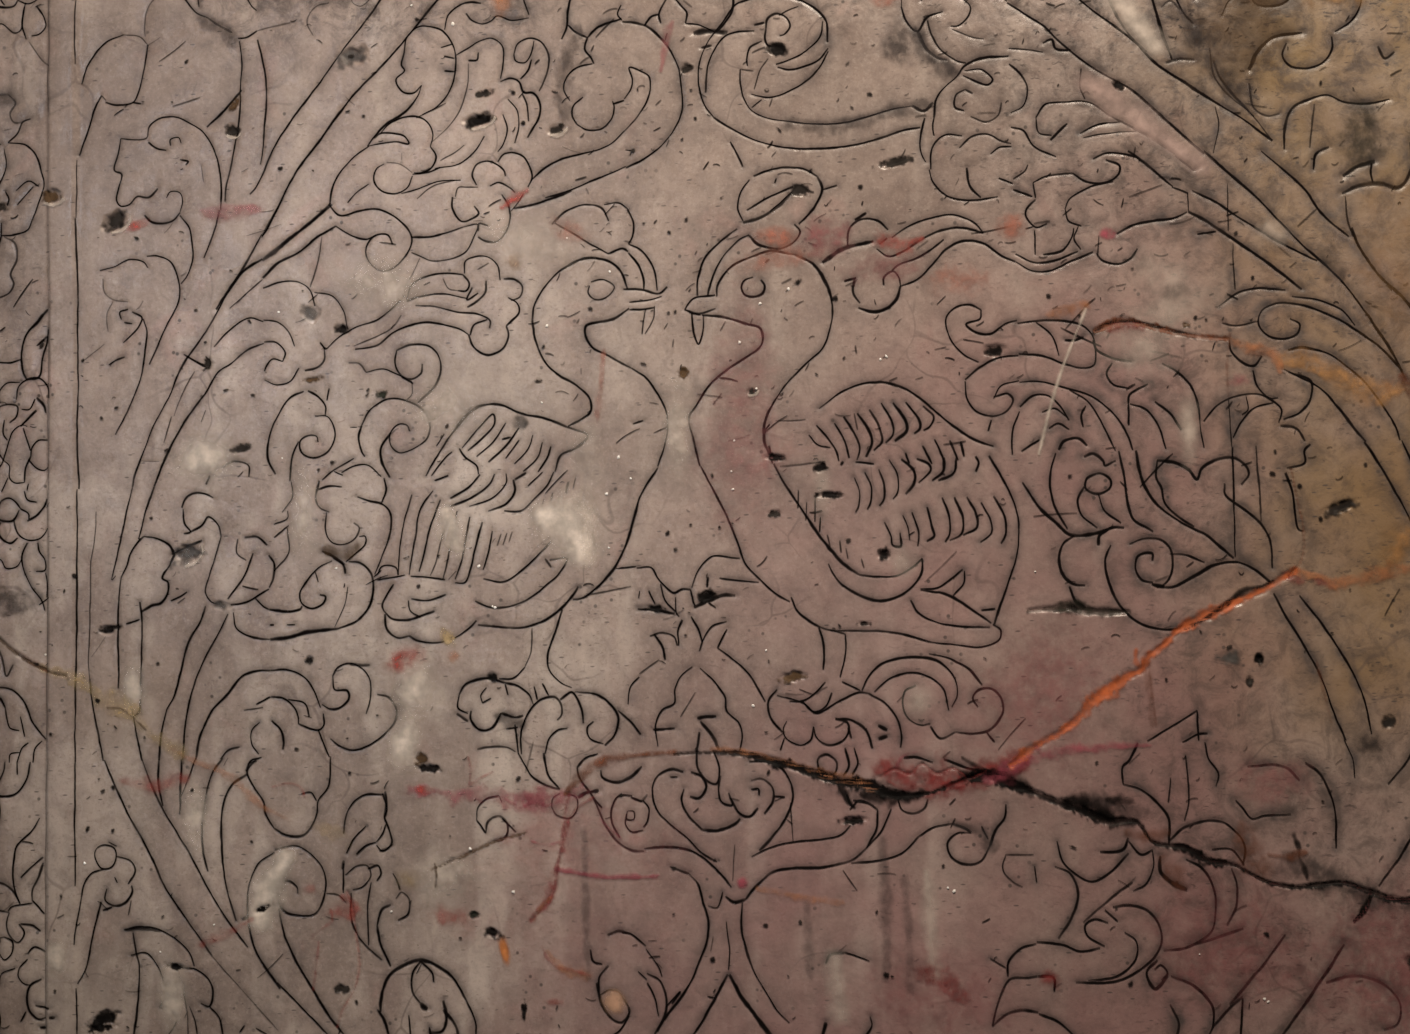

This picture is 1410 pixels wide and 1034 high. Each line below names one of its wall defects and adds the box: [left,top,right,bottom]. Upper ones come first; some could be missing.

crack [0,638,67,677]
crack [564,567,1410,922]